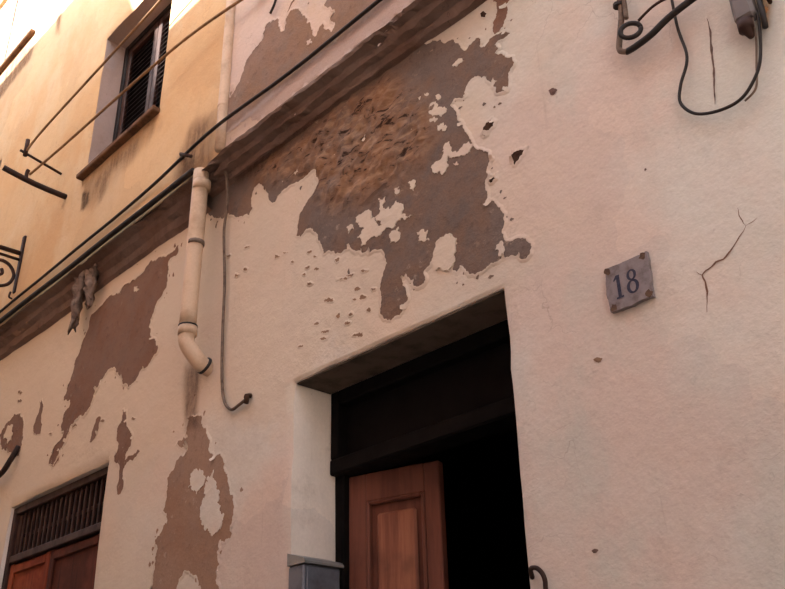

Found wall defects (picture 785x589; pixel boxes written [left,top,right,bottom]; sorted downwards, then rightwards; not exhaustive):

peeling [206,0,536,342]
crack [697,210,756,302]
peeling [0,243,182,469]
peeling [113,407,142,498]
peeling [149,410,243,589]